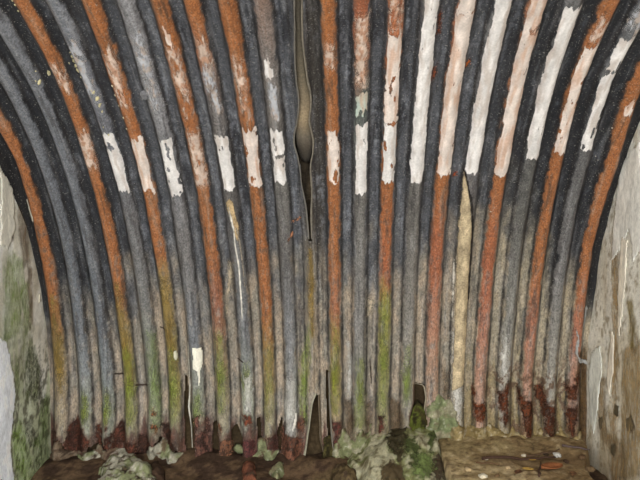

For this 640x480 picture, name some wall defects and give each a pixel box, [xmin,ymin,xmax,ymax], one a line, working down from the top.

peeling [409,0,439,184]
peeling [436,0,476,179]
peeling [494,0,547,178]
peeling [526,5,582,161]
peeling [580,12,640,152]
water stain [4,207,33,340]
water stain [14,342,49,479]
rust [51,415,176,454]
rust [192,416,233,457]
rust [471,384,486,422]
rust [497,381,556,438]
rust [564,374,580,437]